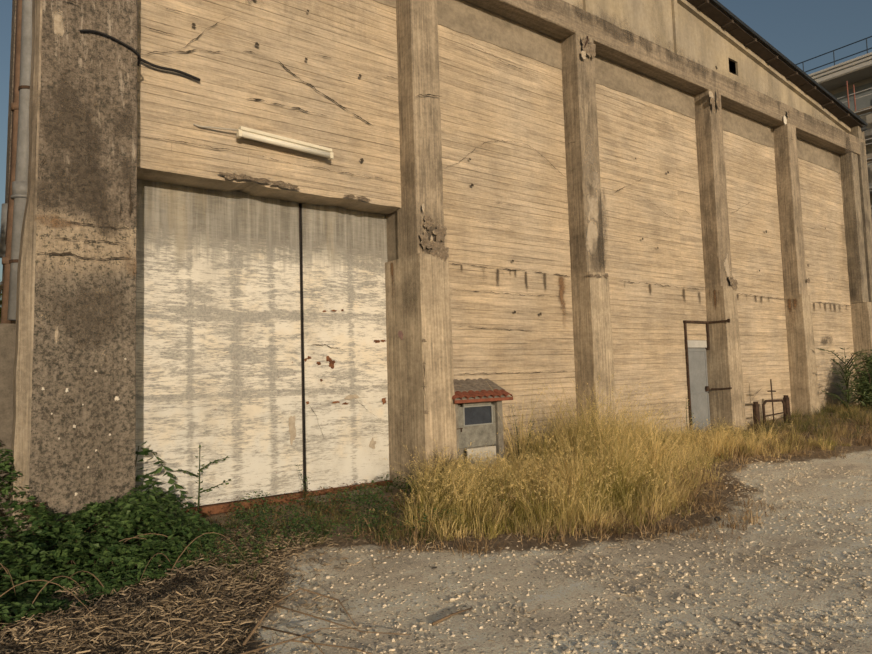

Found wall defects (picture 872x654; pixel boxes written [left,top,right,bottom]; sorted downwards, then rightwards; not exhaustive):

crack [141,8,252,55]
spalling [581,35,596,59]
crack [249,59,373,126]
spalling [218,170,299,190]
crack [42,177,133,260]
spalling [419,204,449,261]